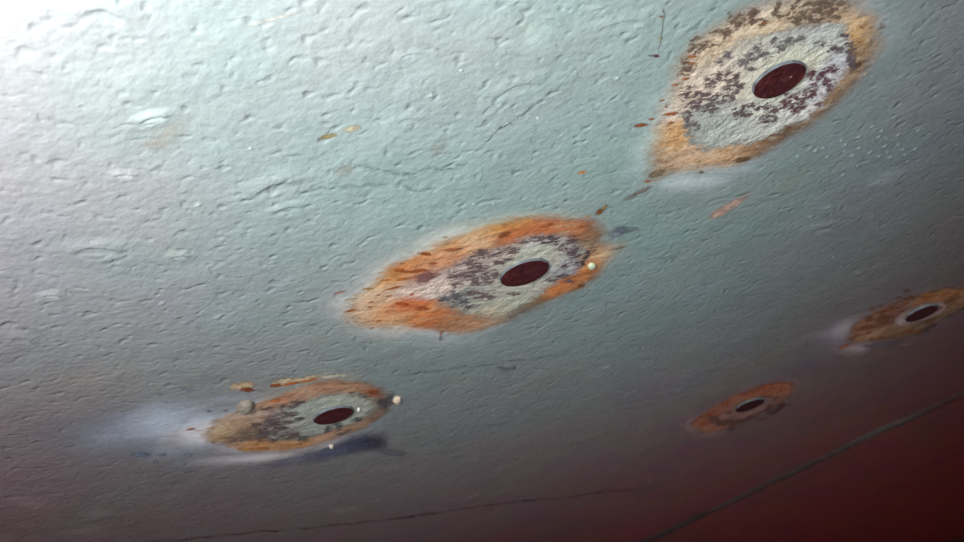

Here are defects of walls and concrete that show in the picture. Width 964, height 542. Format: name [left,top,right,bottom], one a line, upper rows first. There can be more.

rust [623,0,886,201]
rust [334,205,625,341]
rust [822,288,964,350]
rust [83,374,395,464]
rust [692,382,793,435]